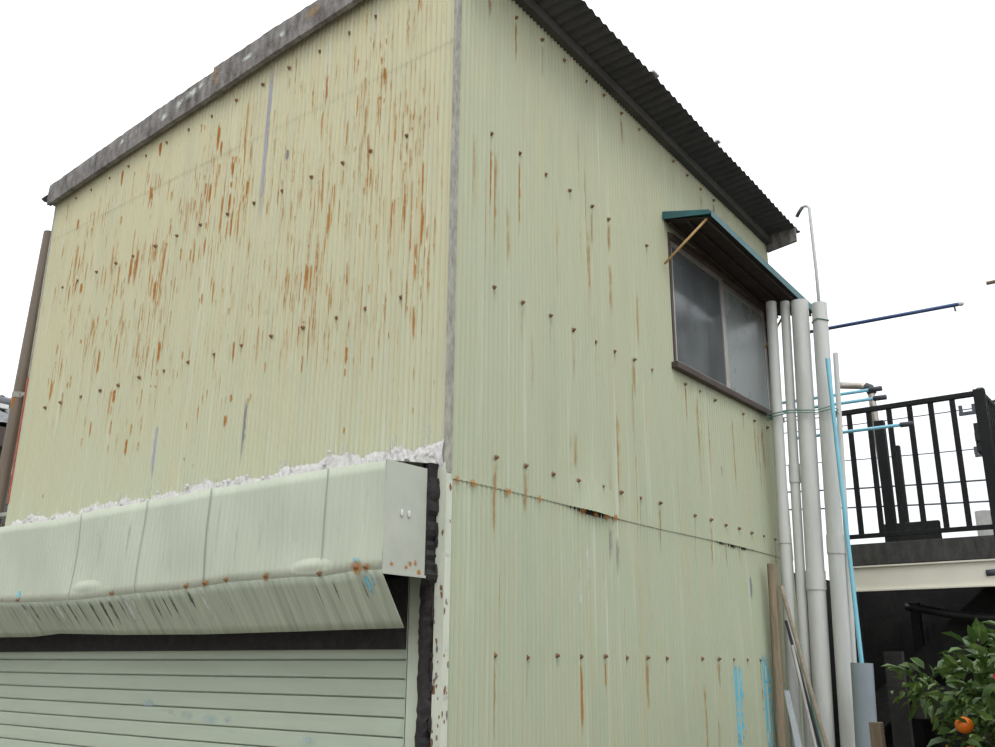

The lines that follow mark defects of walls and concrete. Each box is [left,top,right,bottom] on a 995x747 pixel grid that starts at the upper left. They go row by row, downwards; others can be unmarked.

corrosion [61,119,253,398]
corrosion [261,166,344,370]
corrosion [346,56,435,336]
corrosion [493,474,511,524]